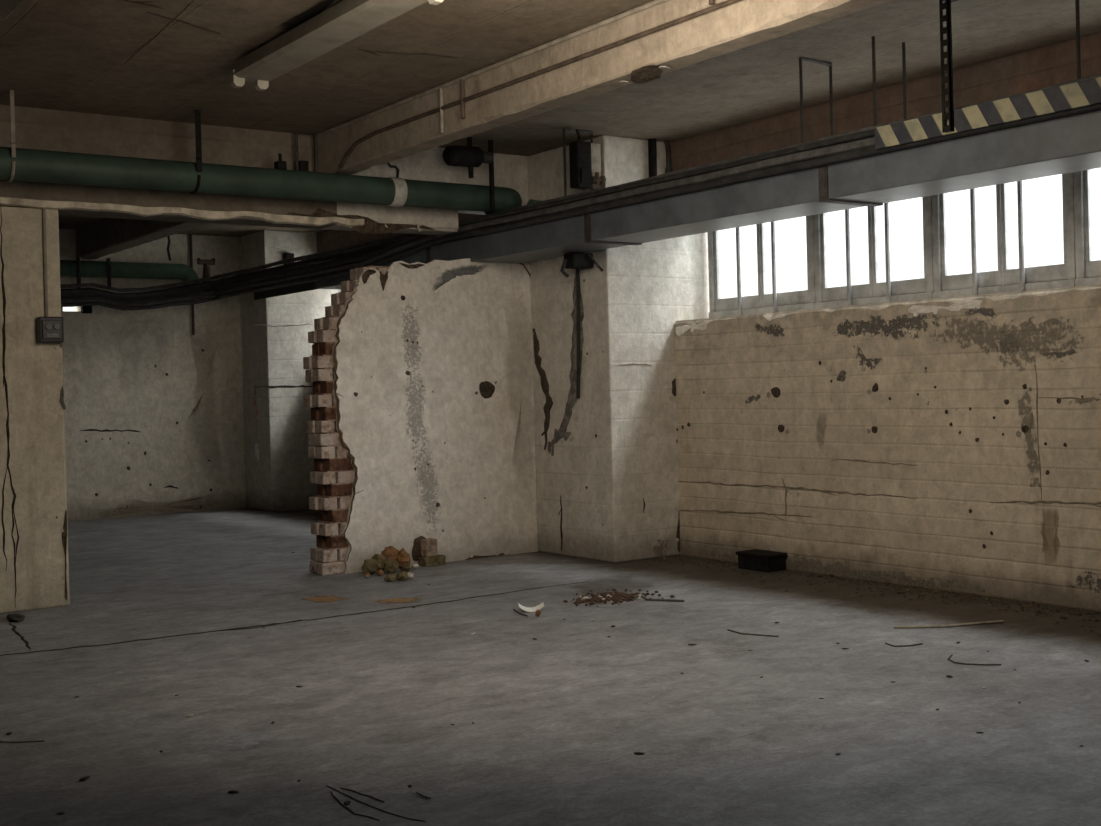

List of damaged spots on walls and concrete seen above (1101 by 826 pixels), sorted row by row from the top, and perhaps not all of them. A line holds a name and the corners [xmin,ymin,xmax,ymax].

leakage [834,308,1082,371]
crack [0,213,590,656]
leakage [1018,392,1041,487]